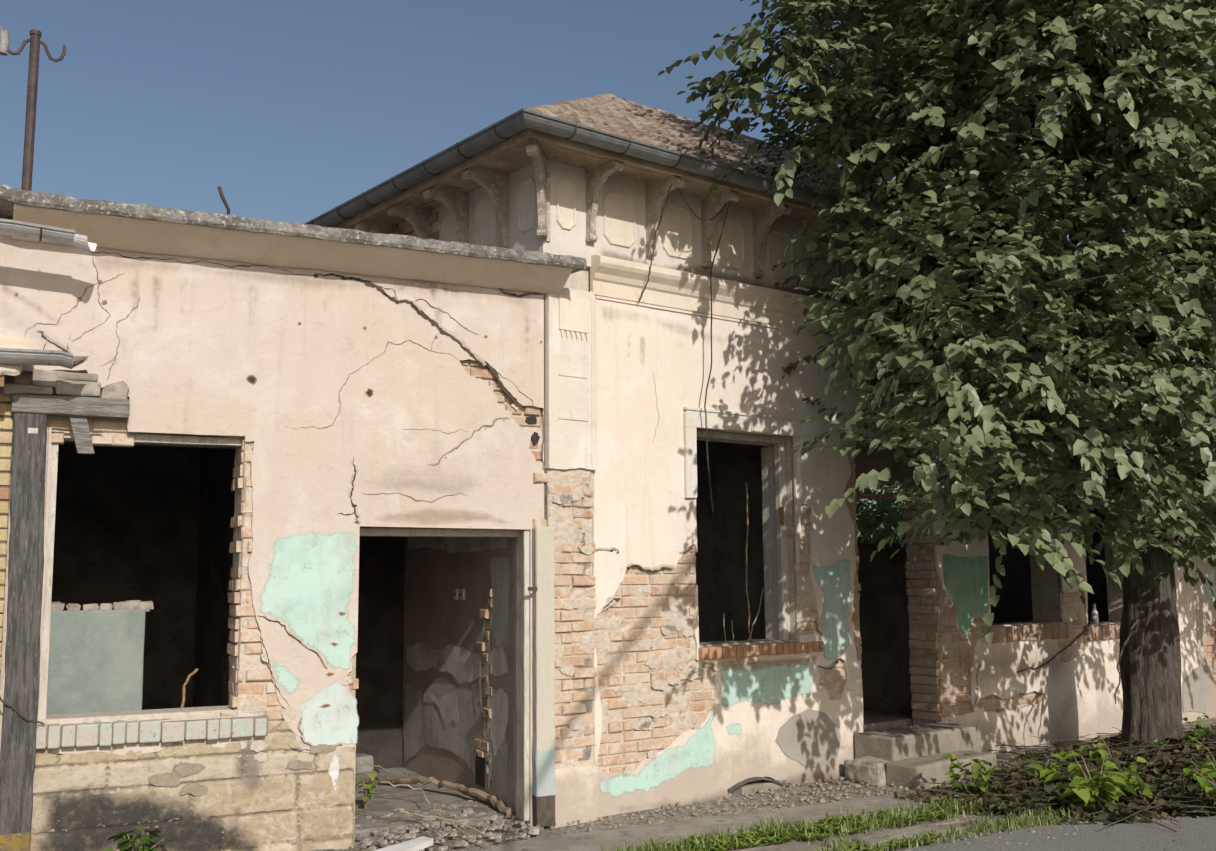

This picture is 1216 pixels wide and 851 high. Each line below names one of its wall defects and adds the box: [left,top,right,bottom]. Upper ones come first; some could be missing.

crack [24,249,533,466]
water stain [42,793,253,851]
flaking render [29,436,359,851]
water stain [241,746,258,786]
crack [338,457,361,524]
peeling [403,537,510,798]
flaking render [460,360,869,797]